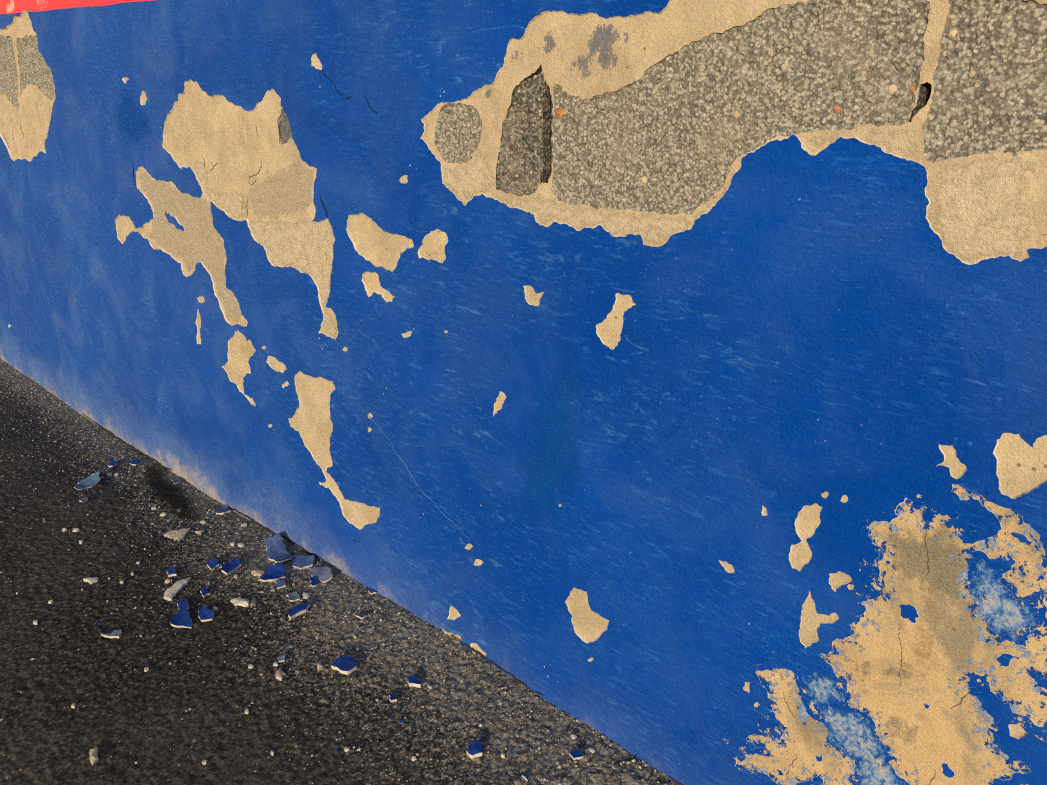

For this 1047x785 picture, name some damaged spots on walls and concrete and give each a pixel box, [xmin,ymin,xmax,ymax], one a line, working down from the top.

spalling [0,0,55,162]
spalling [420,0,1047,265]
flaking render [115,79,380,530]
flaking render [346,213,448,302]
flaking render [523,285,544,306]
flaking render [596,293,636,350]
flaking render [565,588,609,643]
flaking render [719,560,735,573]
flaking render [730,433,1047,785]